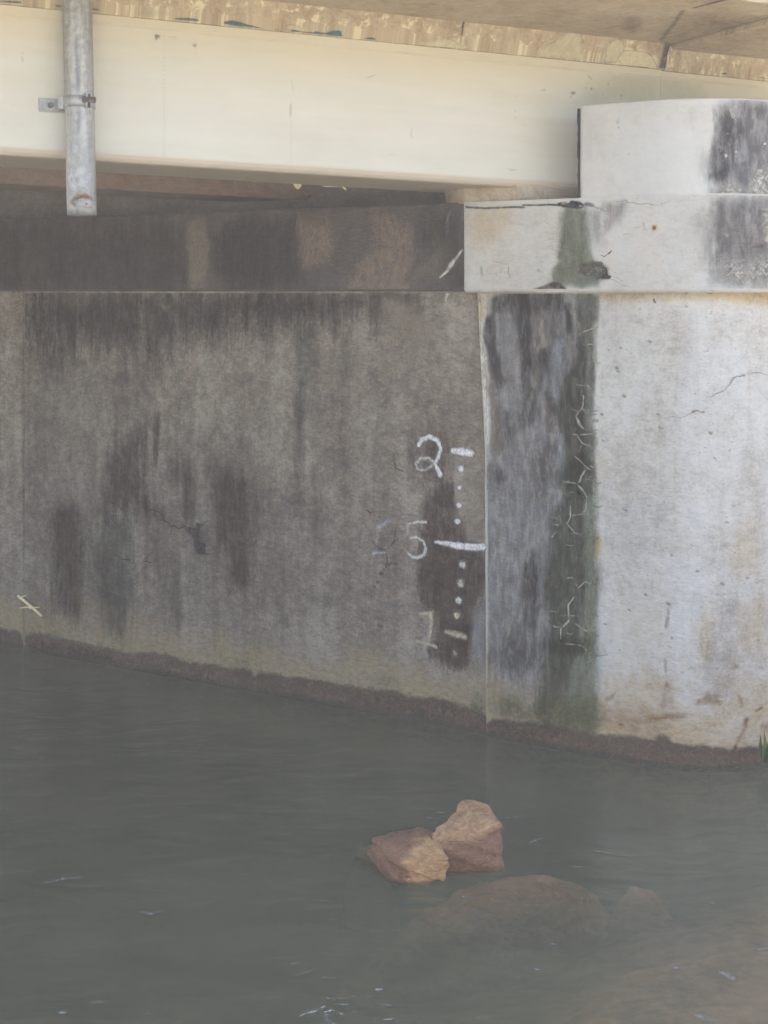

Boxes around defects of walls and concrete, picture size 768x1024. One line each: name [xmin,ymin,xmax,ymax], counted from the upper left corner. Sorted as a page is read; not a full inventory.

crack [465,202,561,210]
damp [716,103,768,279]
spalling [576,262,624,286]
damp [467,295,502,480]
damp [520,295,565,399]
crack [666,372,768,419]
crack [105,501,213,555]
crack [549,327,603,664]
damp [0,443,768,773]